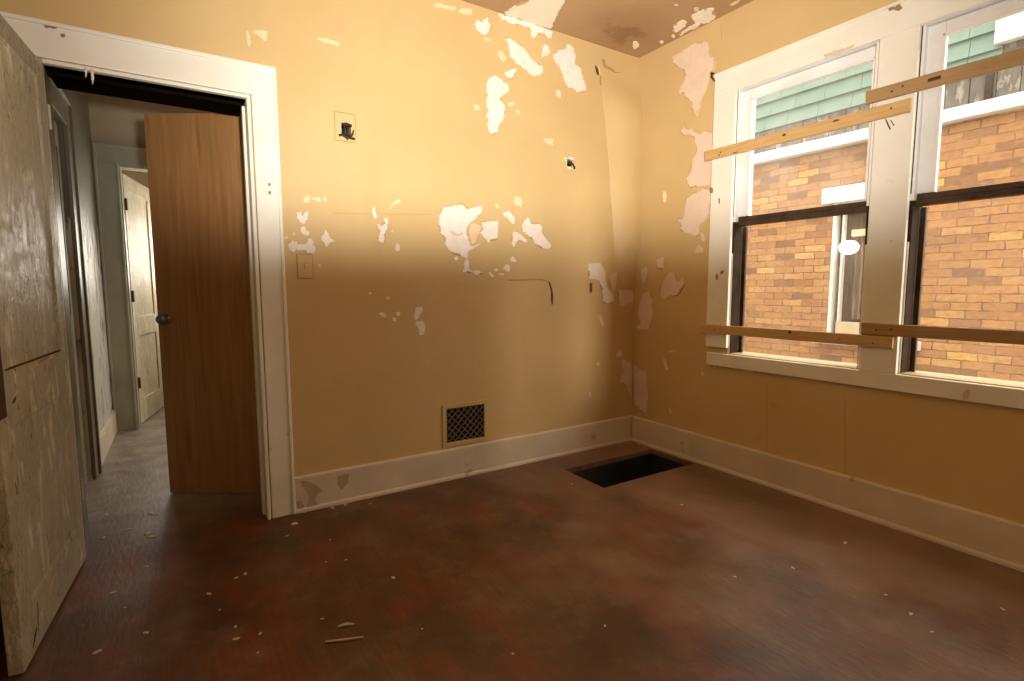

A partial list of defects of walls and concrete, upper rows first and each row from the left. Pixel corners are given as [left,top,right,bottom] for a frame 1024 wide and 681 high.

flaking render [433,0,586,136]
peeling [660,7,720,253]
peeling [284,195,335,267]
peeling [372,199,401,251]
peeling [438,197,552,277]
peeling [588,256,685,330]
peeling [616,351,648,412]